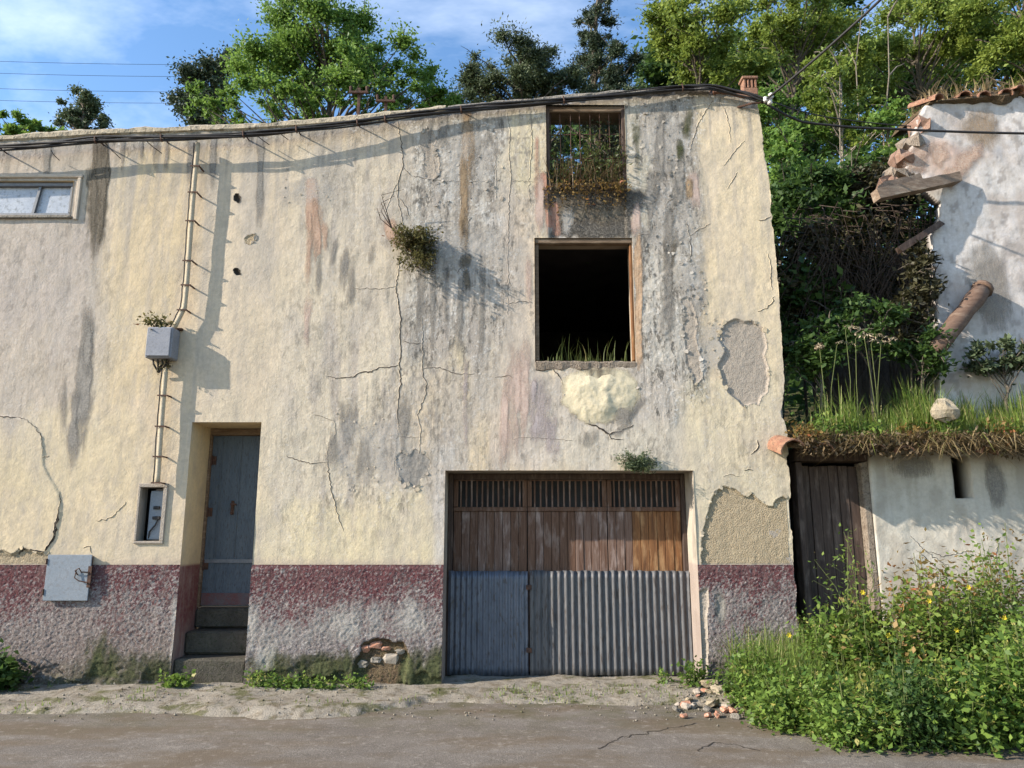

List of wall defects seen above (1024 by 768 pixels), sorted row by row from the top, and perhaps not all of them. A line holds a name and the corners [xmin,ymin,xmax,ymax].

water stain [86,142,124,246]
rust [306,178,327,272]
flaking render [640,103,770,408]
peeling [906,144,983,187]
water stain [60,315,93,461]
crack [327,265,512,475]
crack [0,415,49,458]
crack [286,414,344,531]
peeling [336,412,430,494]
crack [3,492,62,558]
flaking render [700,485,789,564]
spalling [355,638,410,684]